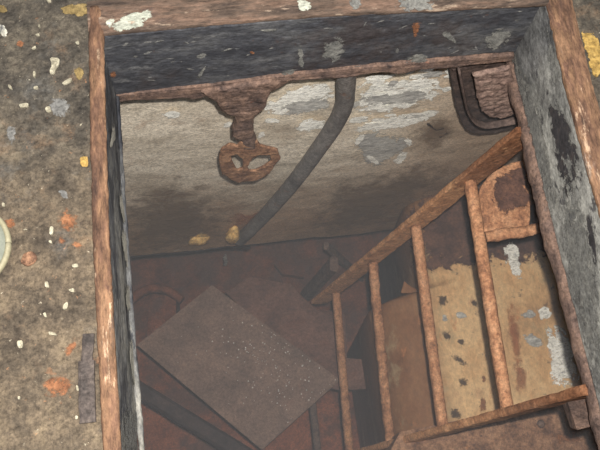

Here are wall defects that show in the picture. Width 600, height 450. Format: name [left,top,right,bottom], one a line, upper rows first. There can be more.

peeling [503,242,522,278]